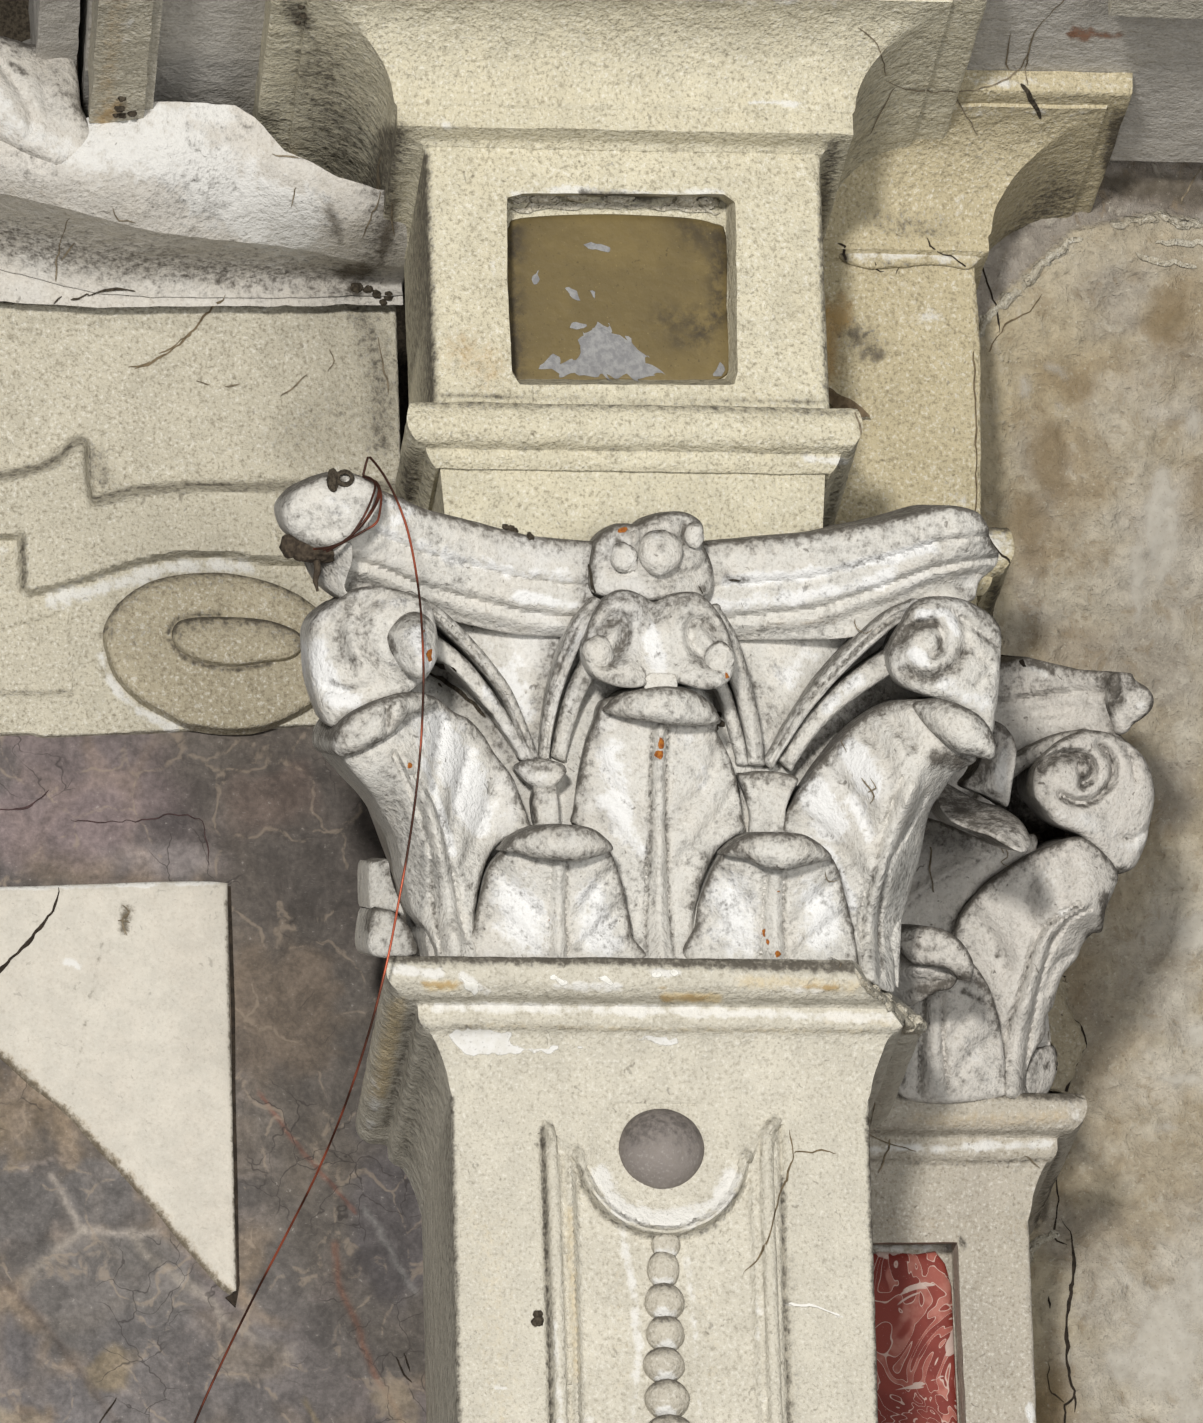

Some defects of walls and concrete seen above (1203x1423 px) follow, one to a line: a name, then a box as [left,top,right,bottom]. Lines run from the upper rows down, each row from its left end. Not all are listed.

corrosion [1068,27,1112,41]
peeling [565,287,595,301]
peeling [584,242,610,252]
crack [838,243,899,273]
crack [129,296,225,369]
peeling [539,322,664,382]
peeling [713,362,725,376]
crack [927,238,1042,563]
crack [0,887,60,973]
crack [1050,1019,1087,1094]
crack [743,1130,835,1274]
crack [1047,1180,1077,1423]